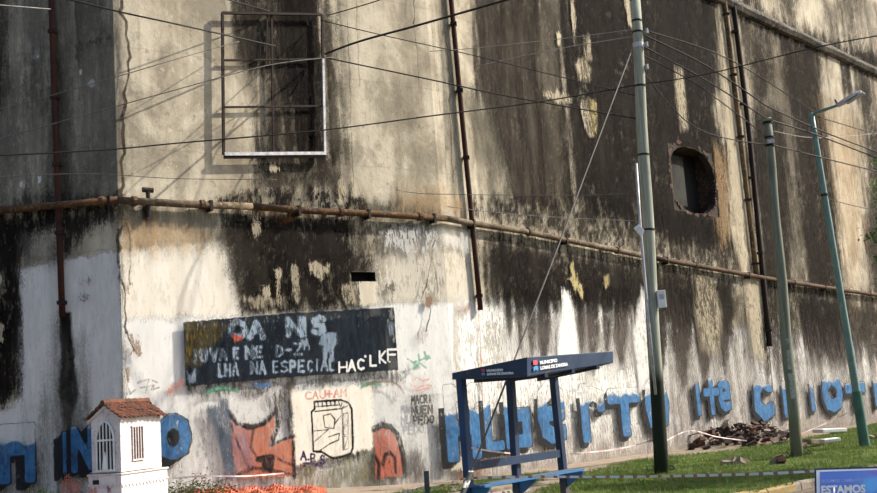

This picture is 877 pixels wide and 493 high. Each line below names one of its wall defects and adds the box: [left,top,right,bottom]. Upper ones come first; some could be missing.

damp [0,0,171,409]
crack [116,0,135,351]
damp [183,0,436,316]
damp [471,0,877,464]